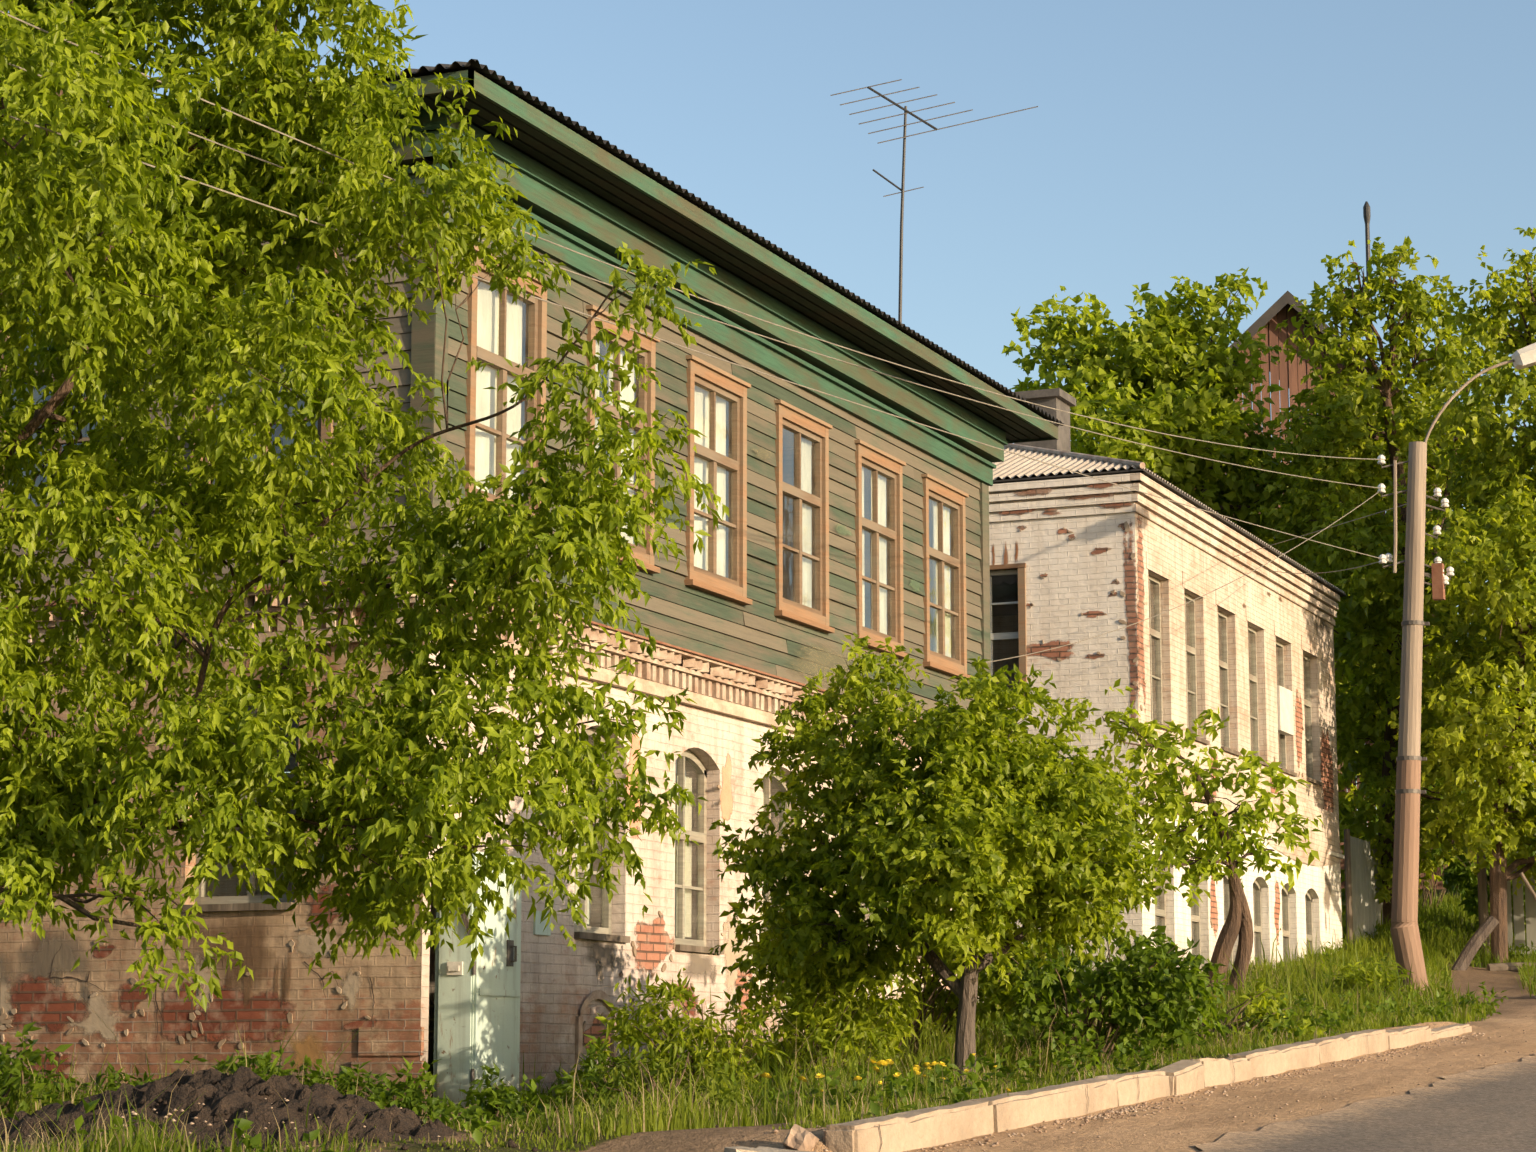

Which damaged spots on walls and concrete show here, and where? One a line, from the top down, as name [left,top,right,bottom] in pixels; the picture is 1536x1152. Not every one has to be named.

spalling [999,482,1147,719]
flaking render [717,754,733,820]
spalling [1295,689,1334,813]
spalling [619,911,675,978]
spalling [0,953,296,1085]
spalling [631,983,700,1034]